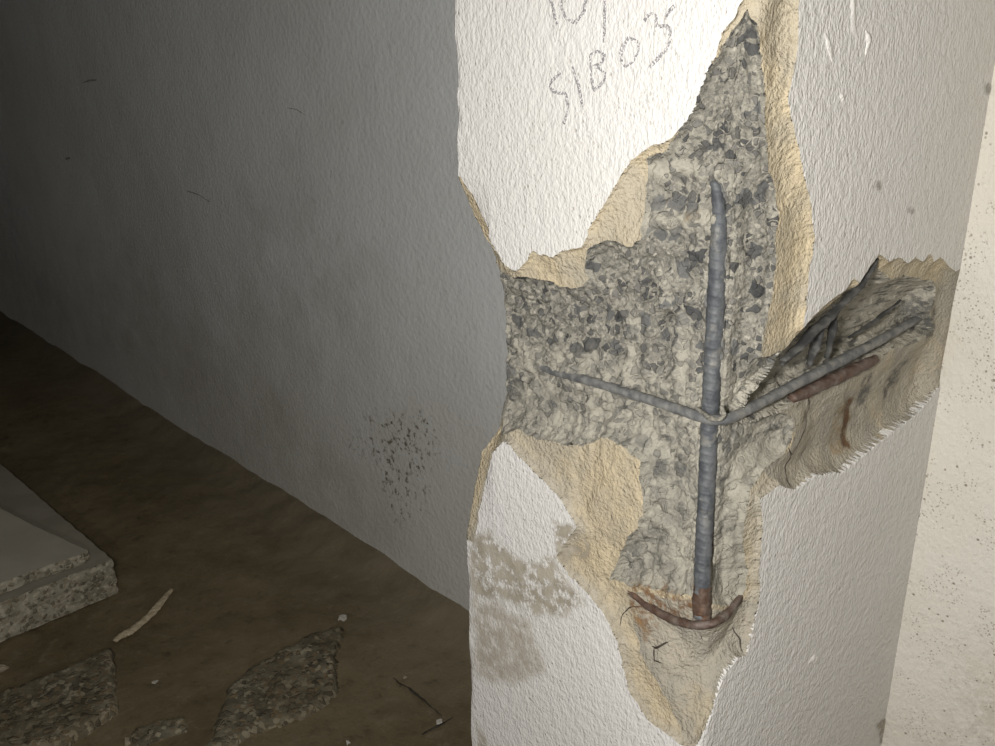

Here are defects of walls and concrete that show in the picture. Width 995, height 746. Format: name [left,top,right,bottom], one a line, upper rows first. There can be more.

spalling [459,0,960,746]
corrosion [787,355,879,403]
corrosion [841,399,853,448]
damp [358,415,433,514]
corrosion [626,585,743,632]